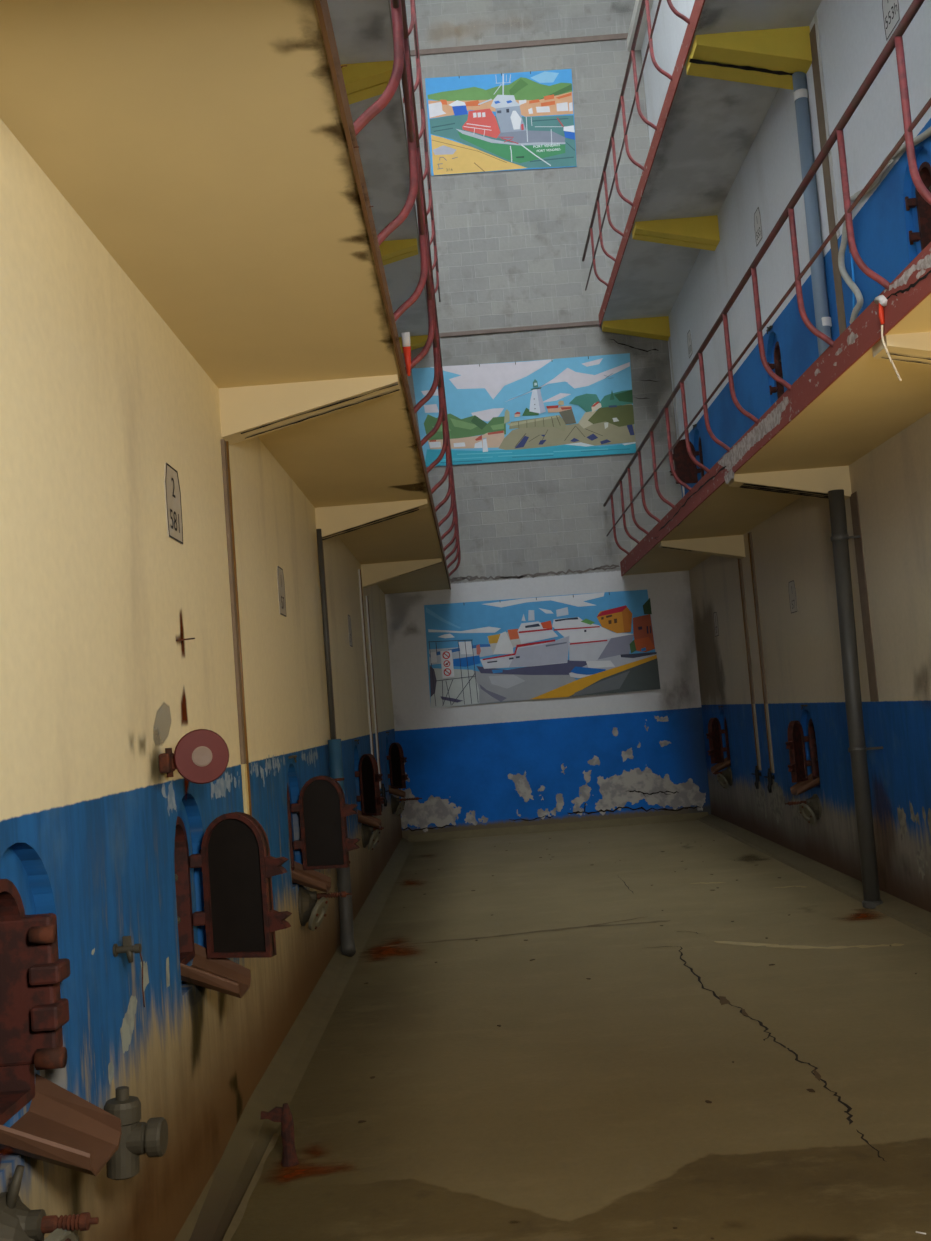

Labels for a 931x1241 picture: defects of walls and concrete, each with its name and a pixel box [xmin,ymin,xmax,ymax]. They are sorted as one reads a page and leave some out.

peeling [401,763,488,832]
peeling [508,716,706,819]
crack [381,879,887,1162]